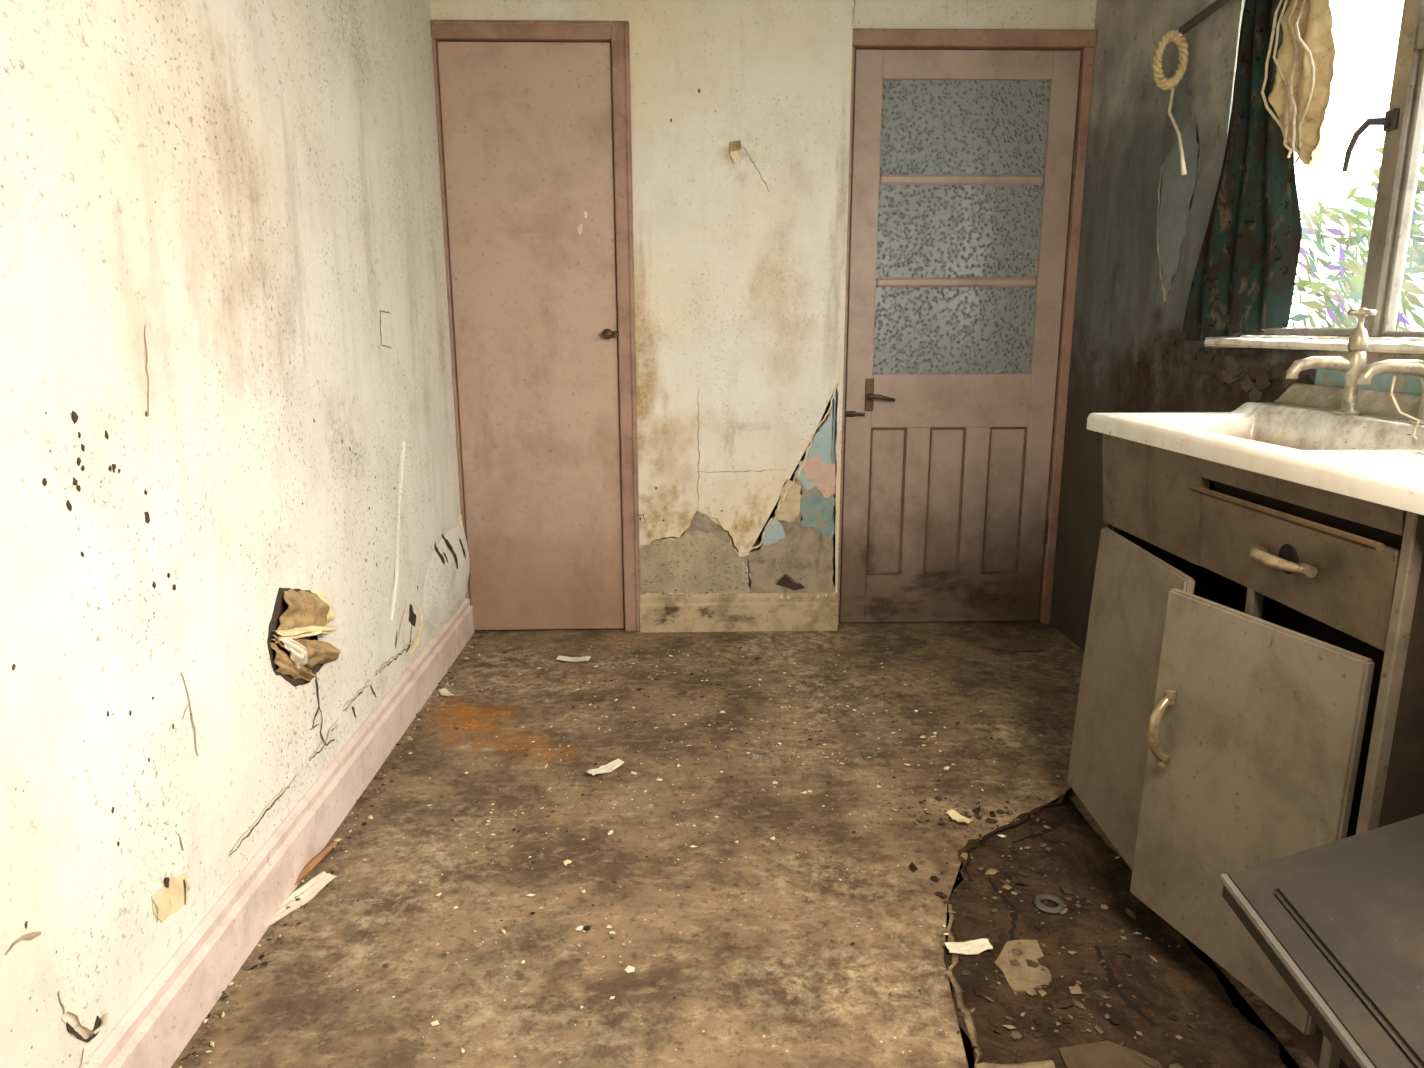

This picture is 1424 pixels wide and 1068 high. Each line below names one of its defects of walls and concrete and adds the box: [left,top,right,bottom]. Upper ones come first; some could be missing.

water stain [1122,314,1278,413]
spalling [639,386,838,599]
hole [267,588,324,687]
crack [309,673,376,746]
spalling [151,872,188,922]